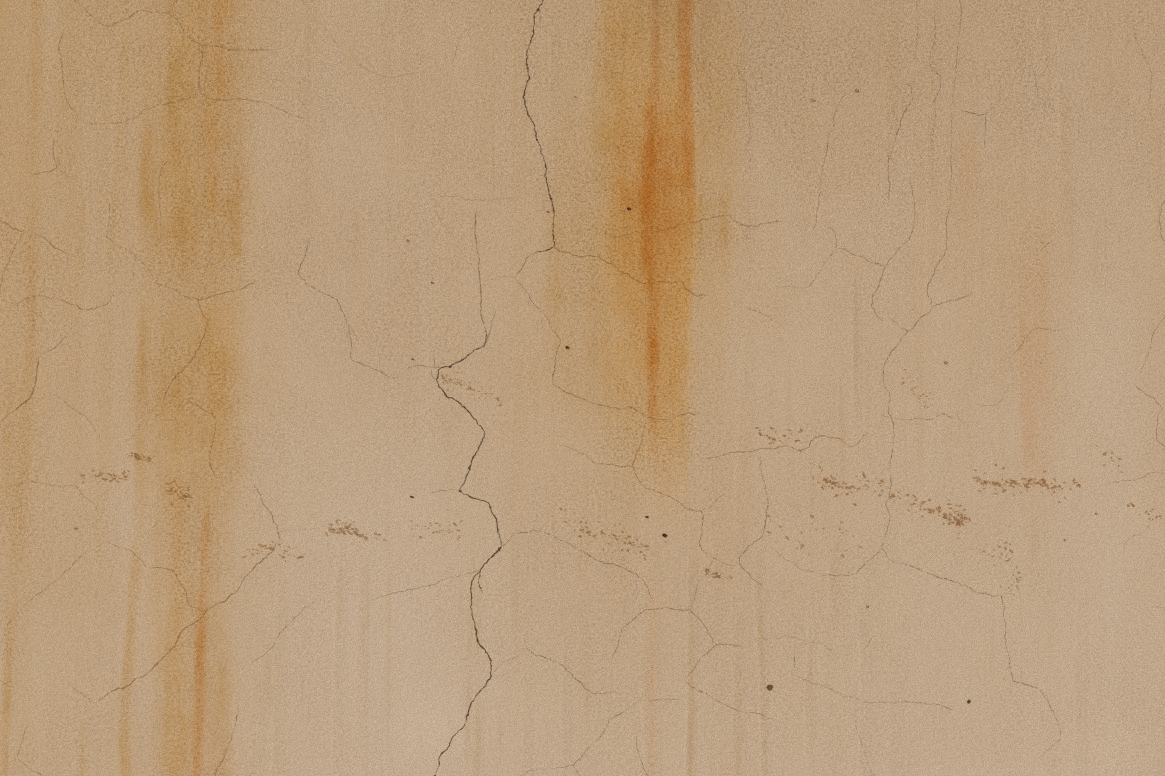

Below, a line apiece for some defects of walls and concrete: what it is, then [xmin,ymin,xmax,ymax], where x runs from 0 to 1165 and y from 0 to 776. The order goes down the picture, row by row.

crack [104,490,279,697]
rust [88,0,311,776]
crack [411,214,522,776]
crack [518,0,701,308]
rust [552,0,722,574]